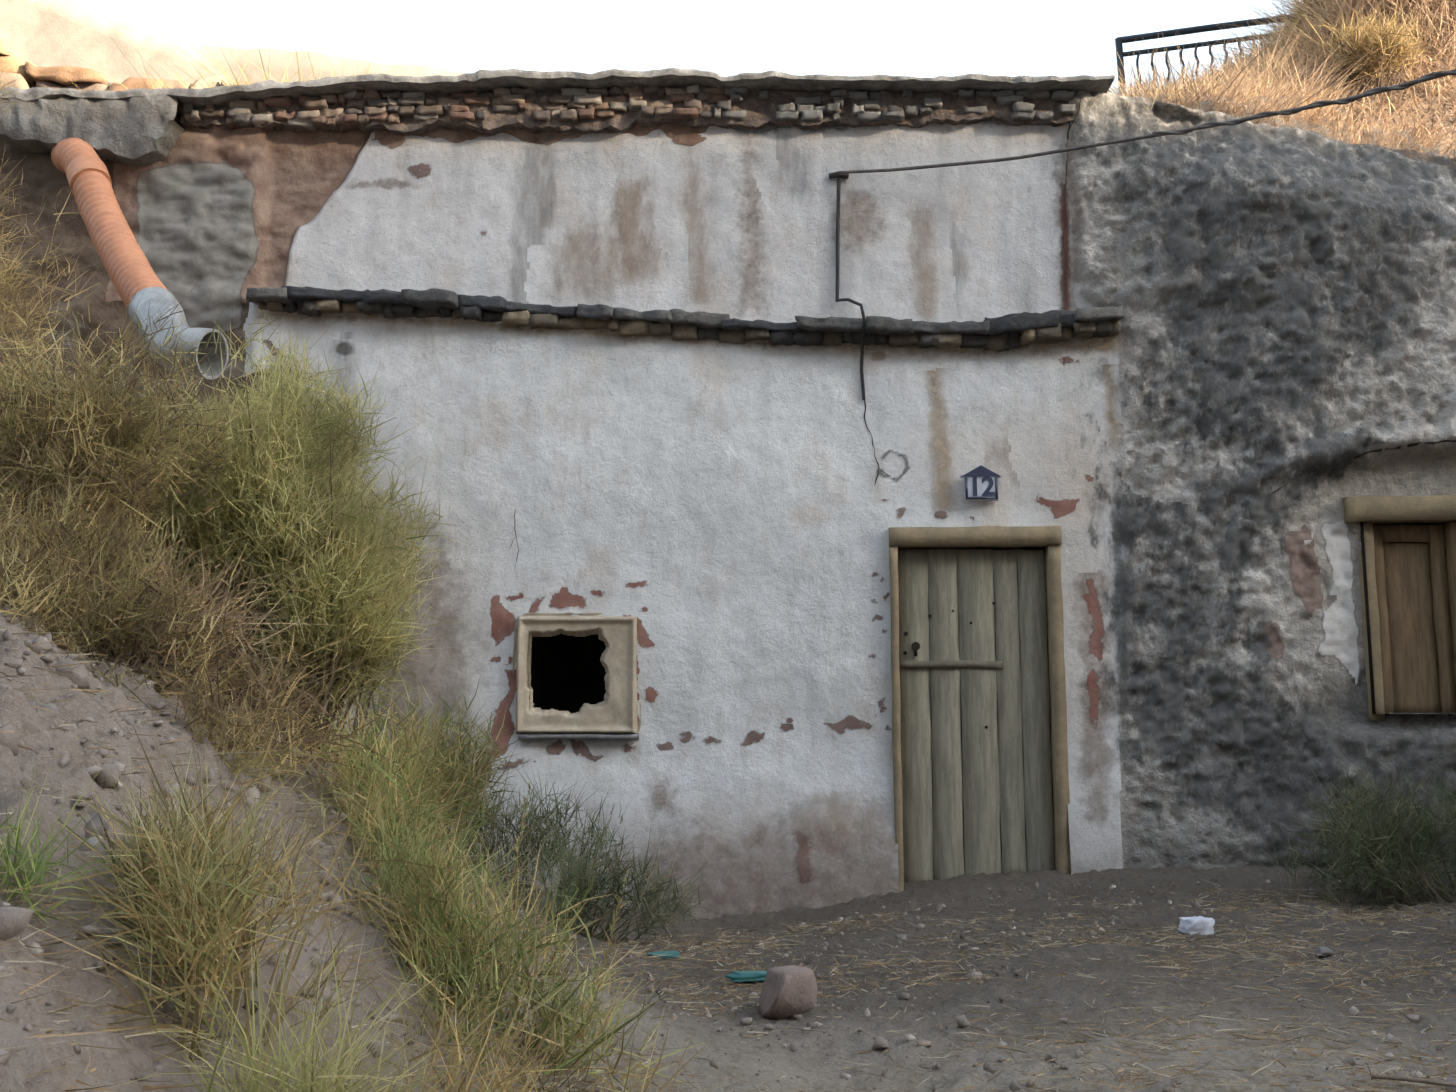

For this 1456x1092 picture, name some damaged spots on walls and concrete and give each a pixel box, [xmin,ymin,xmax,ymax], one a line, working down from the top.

damp [743,182,759,303]
peeling [1036,497,1079,519]
damp [1089,90,1456,831]
peeling [490,587,604,771]
peeling [623,607,658,721]
peeling [656,731,721,751]
peeling [741,718,794,746]
peeling [824,698,891,734]
spalling [871,572,890,632]
peeling [1080,573,1112,814]
spalling [1257,621,1284,660]
flaking render [1284,519,1360,685]